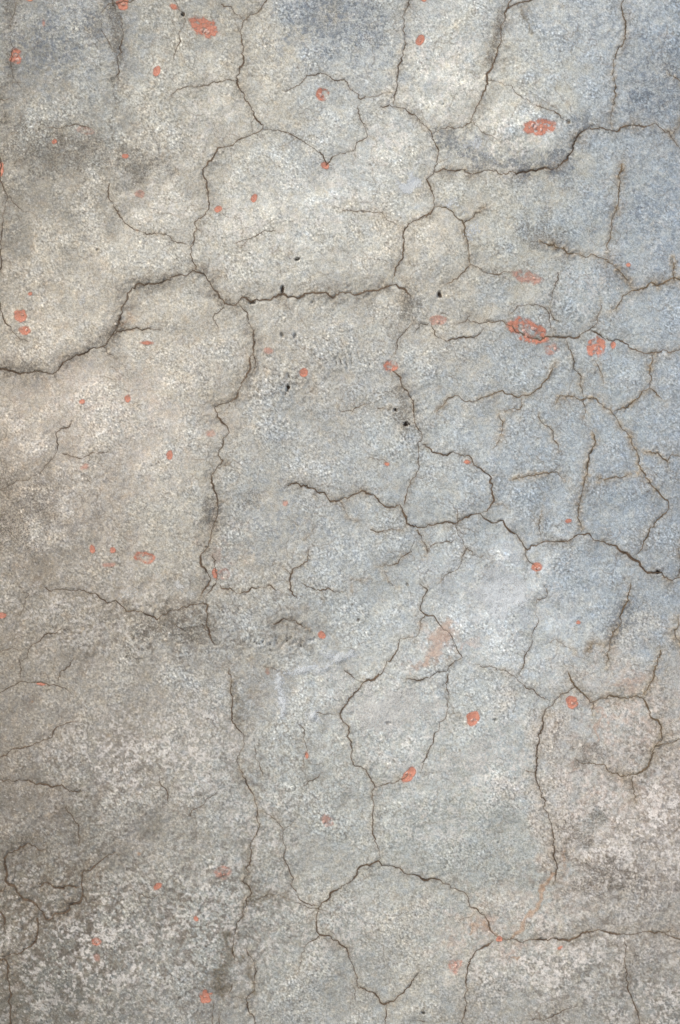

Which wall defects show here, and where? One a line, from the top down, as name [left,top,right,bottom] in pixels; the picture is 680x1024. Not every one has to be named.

crack [0,0,680,645]
crack [1,629,74,693]
crack [212,163,680,1024]
crack [0,721,80,845]
crack [0,843,115,1024]